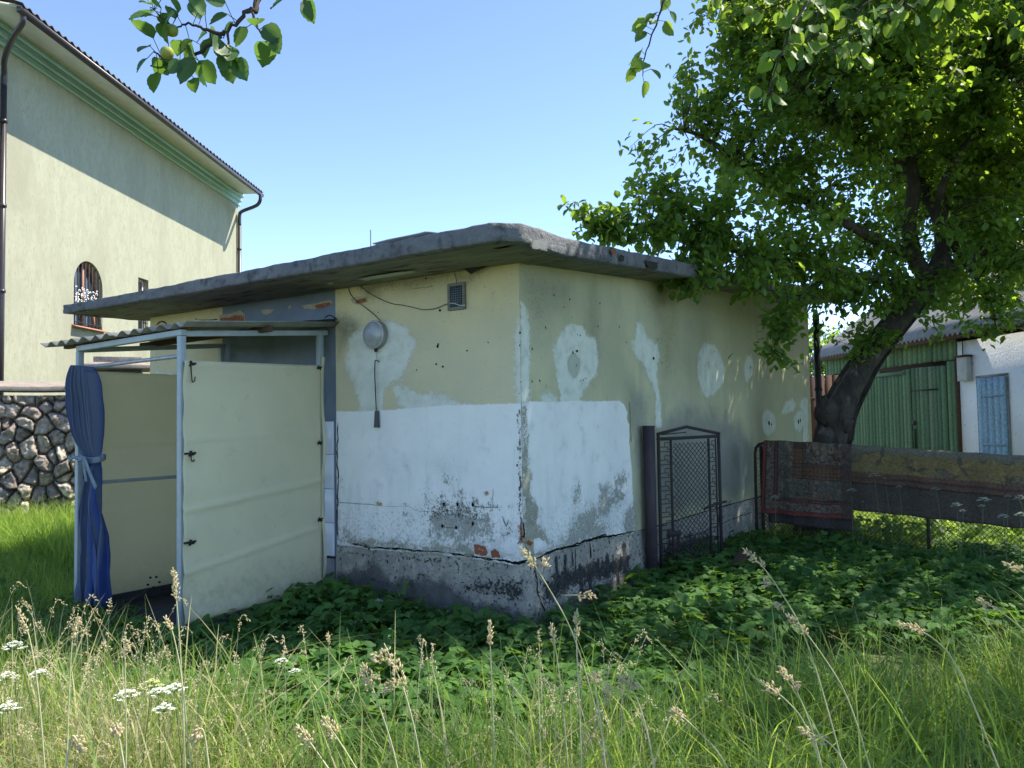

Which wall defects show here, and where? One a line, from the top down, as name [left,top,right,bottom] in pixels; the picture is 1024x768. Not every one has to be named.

water stain [336,550,523,633]
peeling [336,380,639,560]
crack [336,425,761,609]
water stain [539,280,758,628]